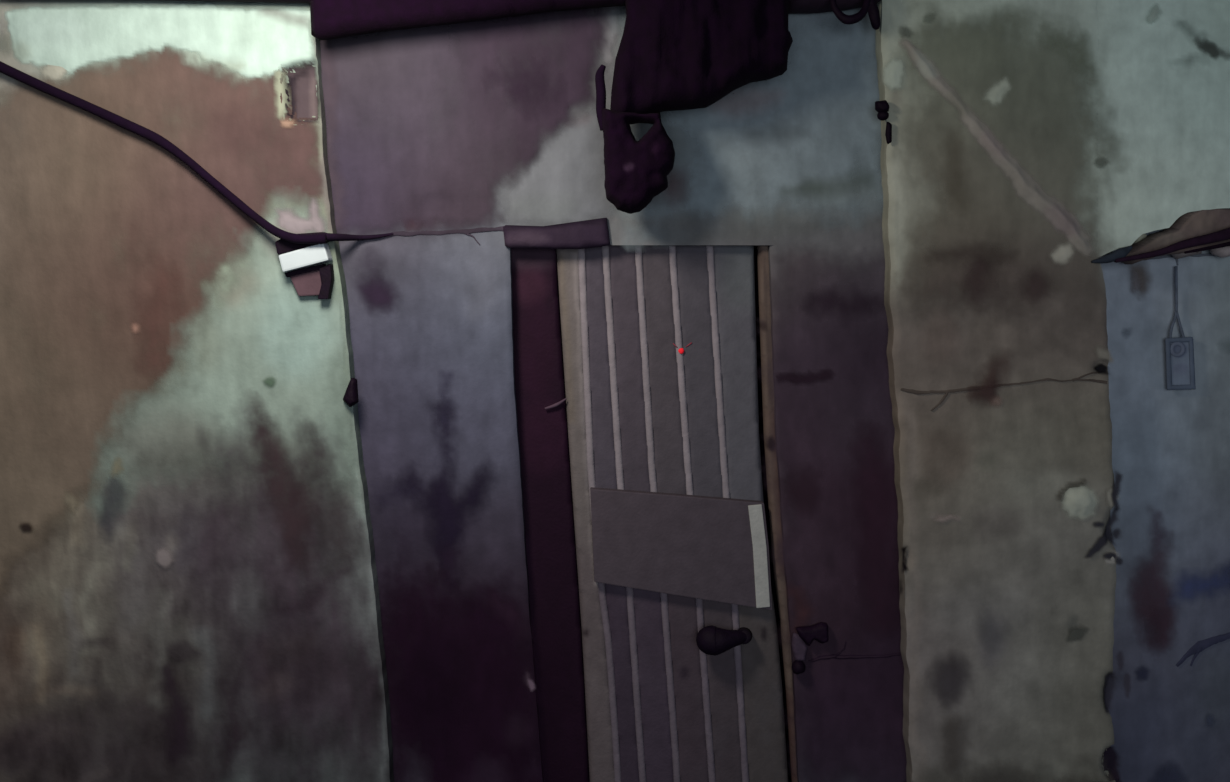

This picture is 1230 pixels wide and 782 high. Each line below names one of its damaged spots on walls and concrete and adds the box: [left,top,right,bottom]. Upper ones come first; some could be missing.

flaking render [985,78,1010,104]
leakage [0,8,604,594]
crack [901,372,1108,411]
leakage [198,426,378,725]
corrosion [1133,535,1172,644]
crack [1176,632,1230,667]